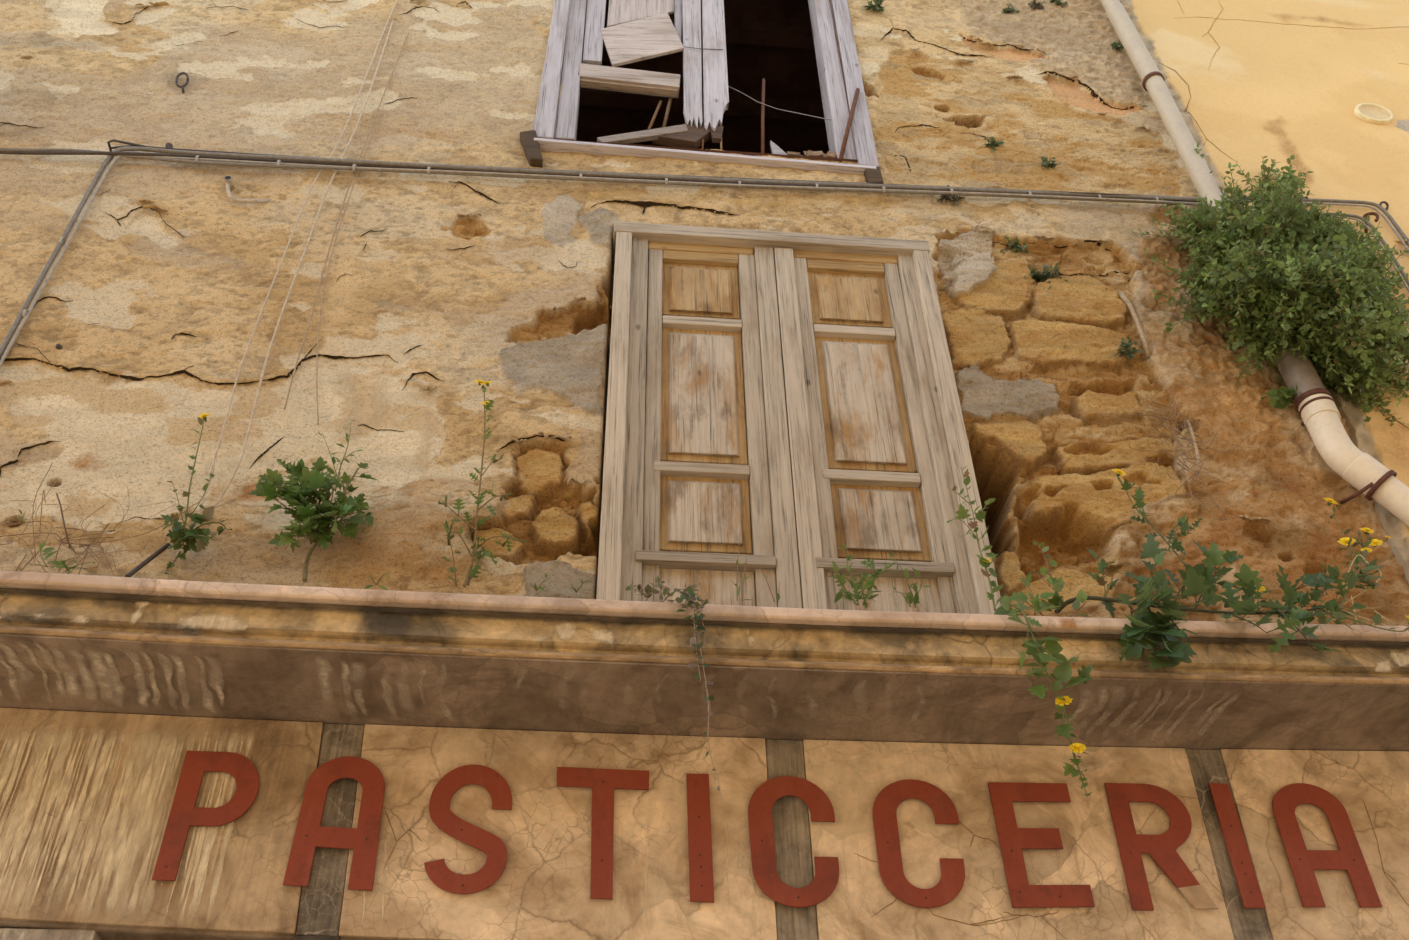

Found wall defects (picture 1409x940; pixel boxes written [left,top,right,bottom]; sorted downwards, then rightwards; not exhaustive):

crack [879,22,1145,110]
peeling [1396,120,1409,132]
crack [101,190,185,238]
flaking render [444,212,490,240]
crack [591,200,738,215]
crack [33,296,99,325]
flaking render [505,282,612,351]
crack [0,332,442,389]
flaking render [933,227,1202,616]
flaking render [469,431,601,565]
crack [1363,800,1407,903]
crack [931,912,1065,938]